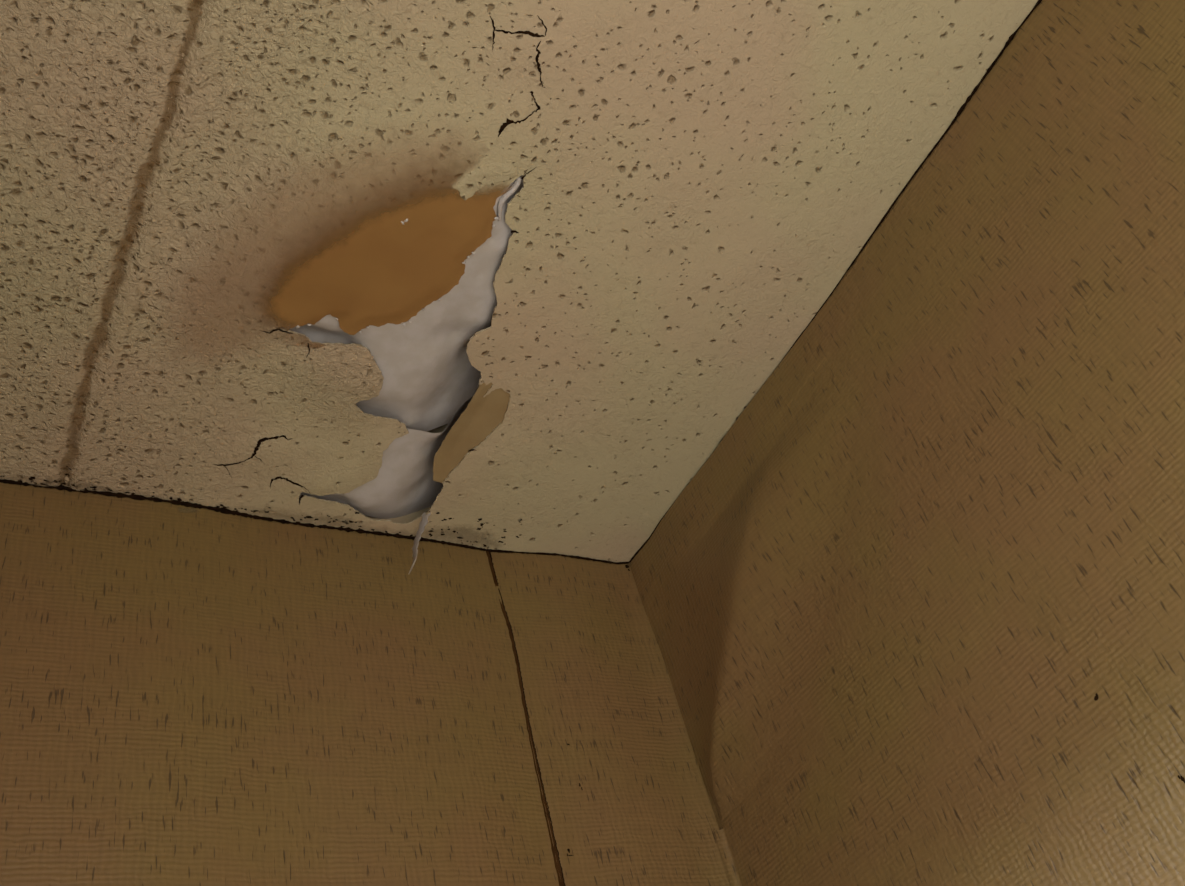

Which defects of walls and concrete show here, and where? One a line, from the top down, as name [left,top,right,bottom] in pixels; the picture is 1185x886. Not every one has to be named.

flaking render [279,162,523,519]
crack [490,15,547,137]
crack [779,0,1042,364]
crack [0,435,673,886]